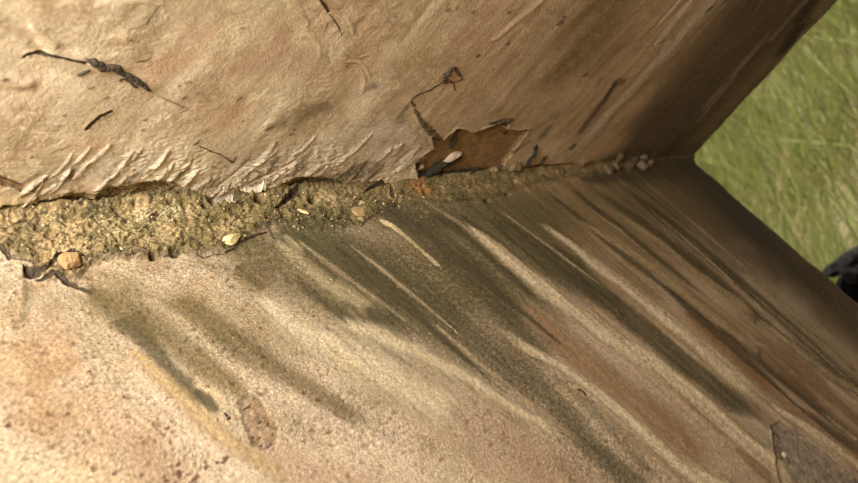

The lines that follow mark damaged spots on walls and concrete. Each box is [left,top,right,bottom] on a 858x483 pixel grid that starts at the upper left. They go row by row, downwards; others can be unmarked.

crack [23,50,152,92]
crack [320,0,342,36]
crack [411,67,464,142]
crack [0,216,92,294]
spalling [0,123,672,277]
water stain [88,287,278,476]
water stain [179,300,355,417]
water stain [236,212,635,483]
water stain [379,190,858,483]